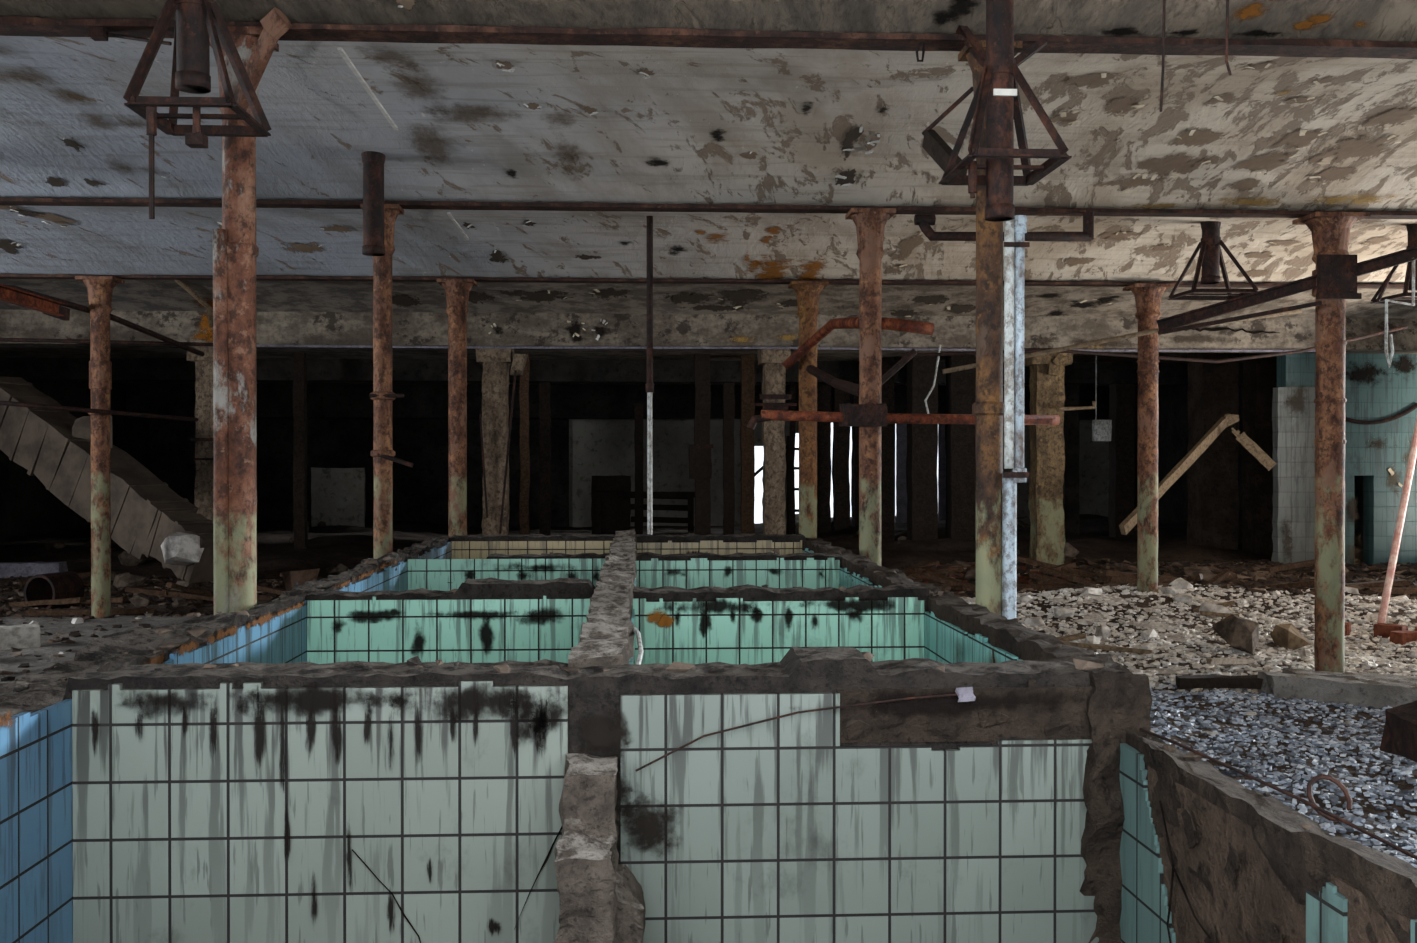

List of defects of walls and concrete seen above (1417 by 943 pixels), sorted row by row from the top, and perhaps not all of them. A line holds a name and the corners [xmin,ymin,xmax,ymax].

spalling [835,124,881,187]
peeling [1093,105,1417,194]
corrosion [744,227,827,280]
peeling [1237,240,1301,277]
leakage [664,599,763,637]
leakage [785,597,895,628]
corrosion [0,712,13,727]
leakage [122,692,217,754]
leakage [871,691,1077,716]
leakage [237,683,564,860]
spalling [1156,782,1306,943]
spalling [1331,874,1411,943]